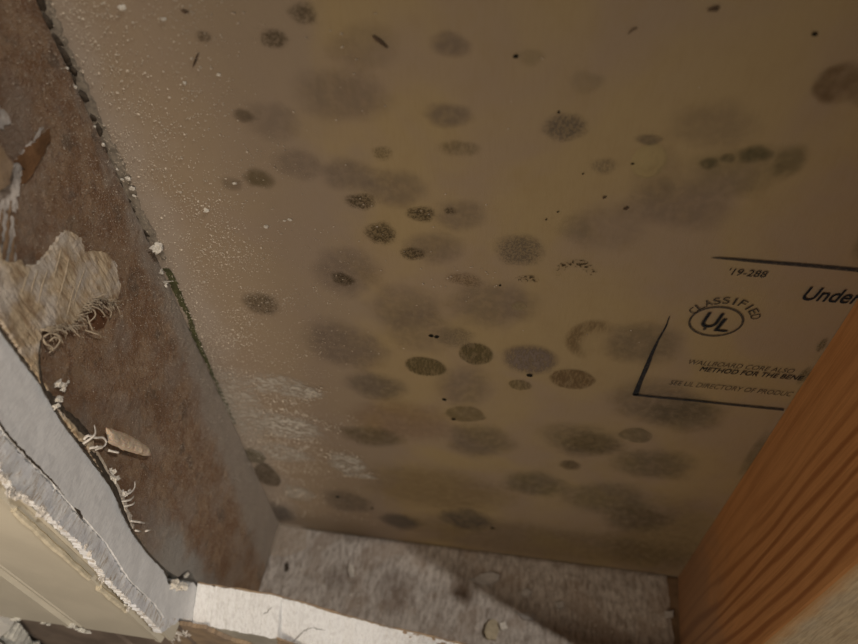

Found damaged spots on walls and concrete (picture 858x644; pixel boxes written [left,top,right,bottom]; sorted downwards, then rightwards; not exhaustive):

peeling [14,129,51,184]
damp [163,268,236,424]
damp [406,358,445,376]
damp [460,344,492,364]